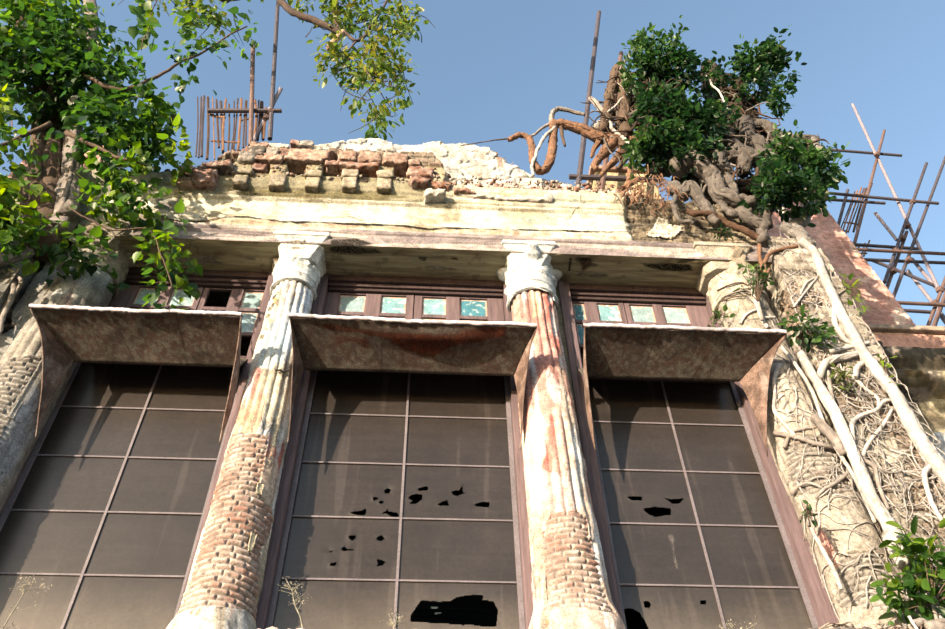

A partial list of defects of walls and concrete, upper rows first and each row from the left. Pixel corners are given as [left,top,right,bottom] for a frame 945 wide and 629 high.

spalling [176,433,274,621]
spalling [541,511,614,614]